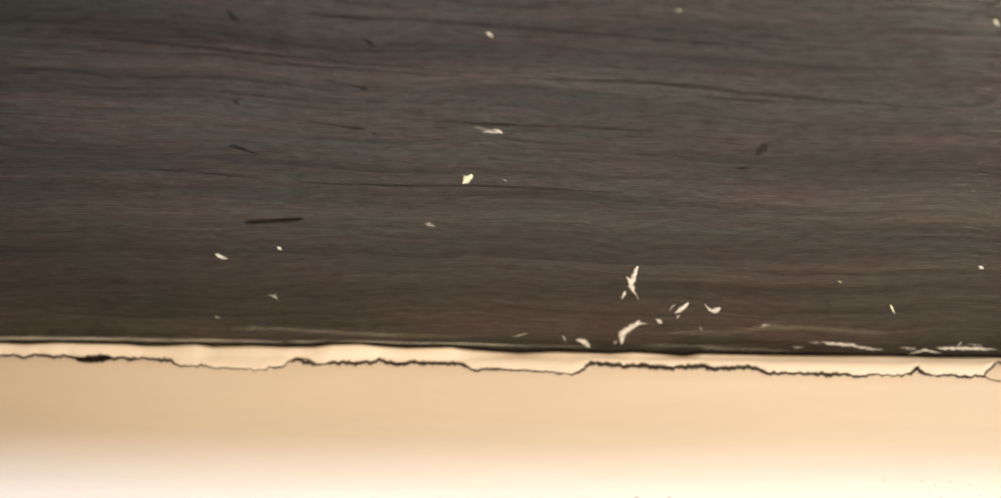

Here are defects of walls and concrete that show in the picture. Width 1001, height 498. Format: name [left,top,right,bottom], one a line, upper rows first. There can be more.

crack [0,353,1001,382]